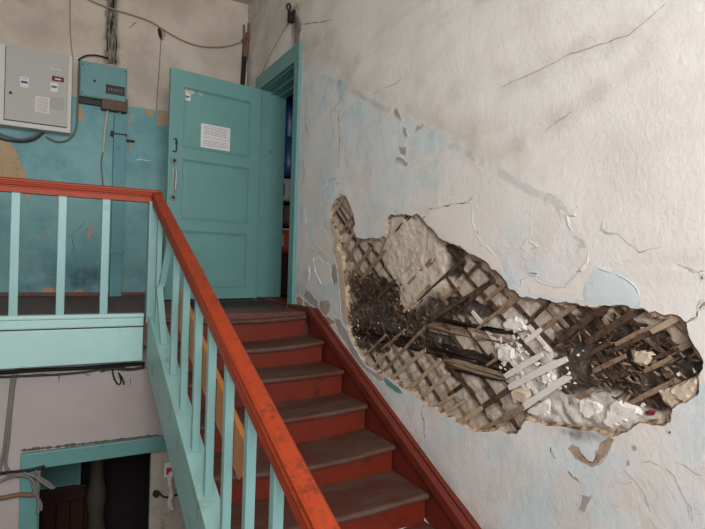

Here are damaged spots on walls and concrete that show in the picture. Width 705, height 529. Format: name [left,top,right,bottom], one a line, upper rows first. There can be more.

crack [502,4,665,87]
peeling [0,139,28,179]
peeling [144,109,168,126]
peeling [393,107,425,168]
crack [600,222,653,253]
flaking render [295,183,703,468]